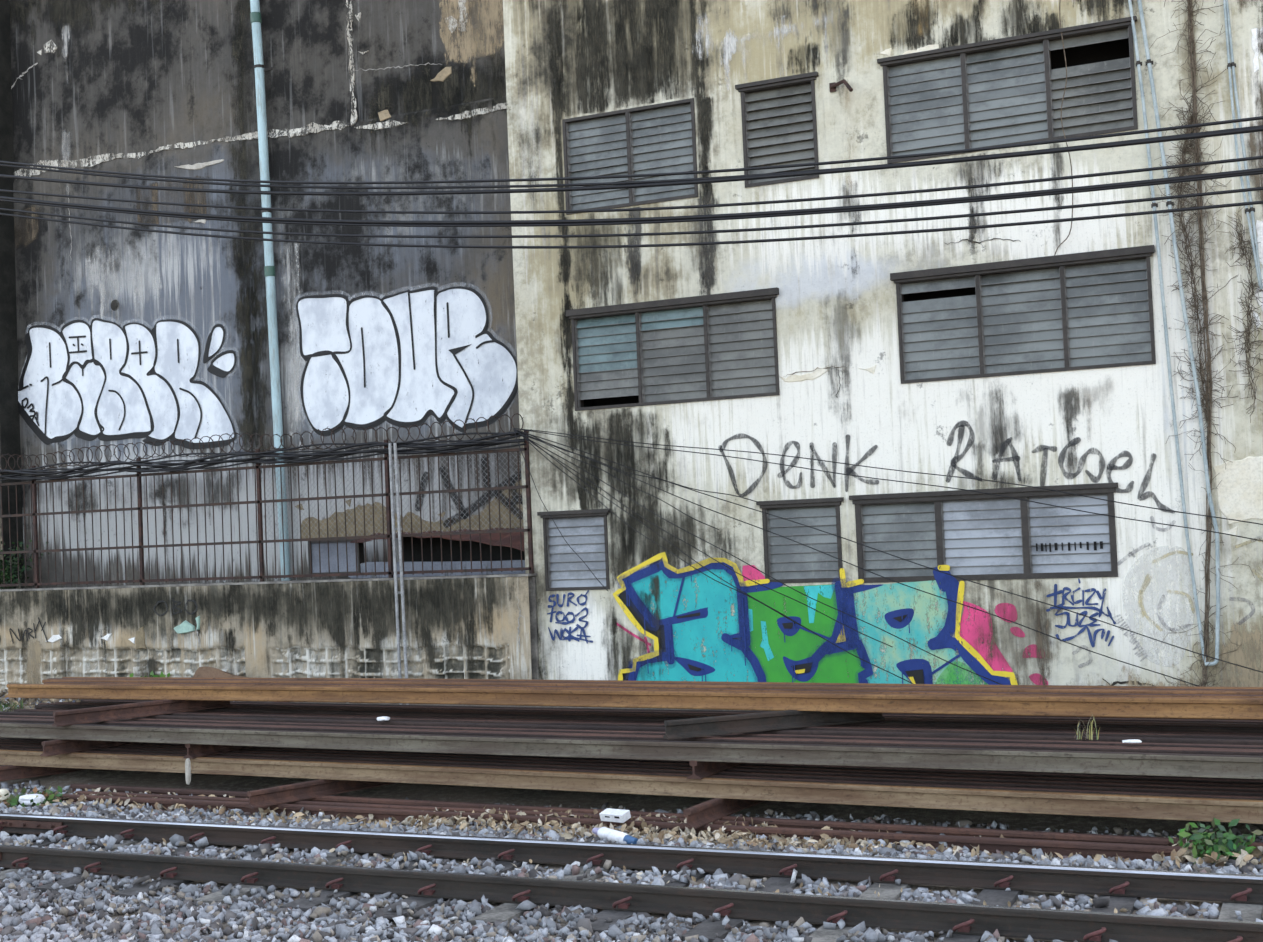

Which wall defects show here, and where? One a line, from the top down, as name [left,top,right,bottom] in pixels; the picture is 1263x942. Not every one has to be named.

crack [11,63,38,89]
crack [351,62,442,72]
peeling [430,0,504,87]
leakage [890,0,988,50]
leakage [1003,0,1060,36]
leakage [1080,0,1133,21]
peeling [1251,26,1263,73]
leakage [229,0,270,472]
leakage [547,0,738,676]
leakage [0,566,511,684]